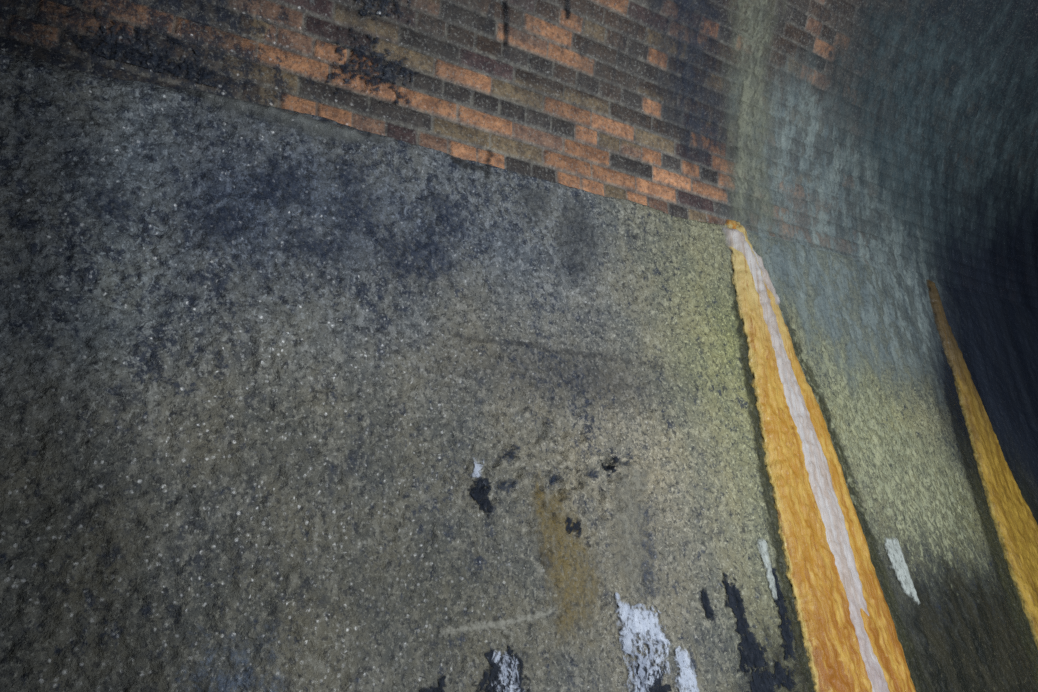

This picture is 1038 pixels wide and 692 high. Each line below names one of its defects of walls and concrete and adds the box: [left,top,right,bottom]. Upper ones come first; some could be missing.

spalling [419,673,447,692]
peeling [474,645,530,692]
peeling [615,593,699,692]
spalling [701,572,797,692]